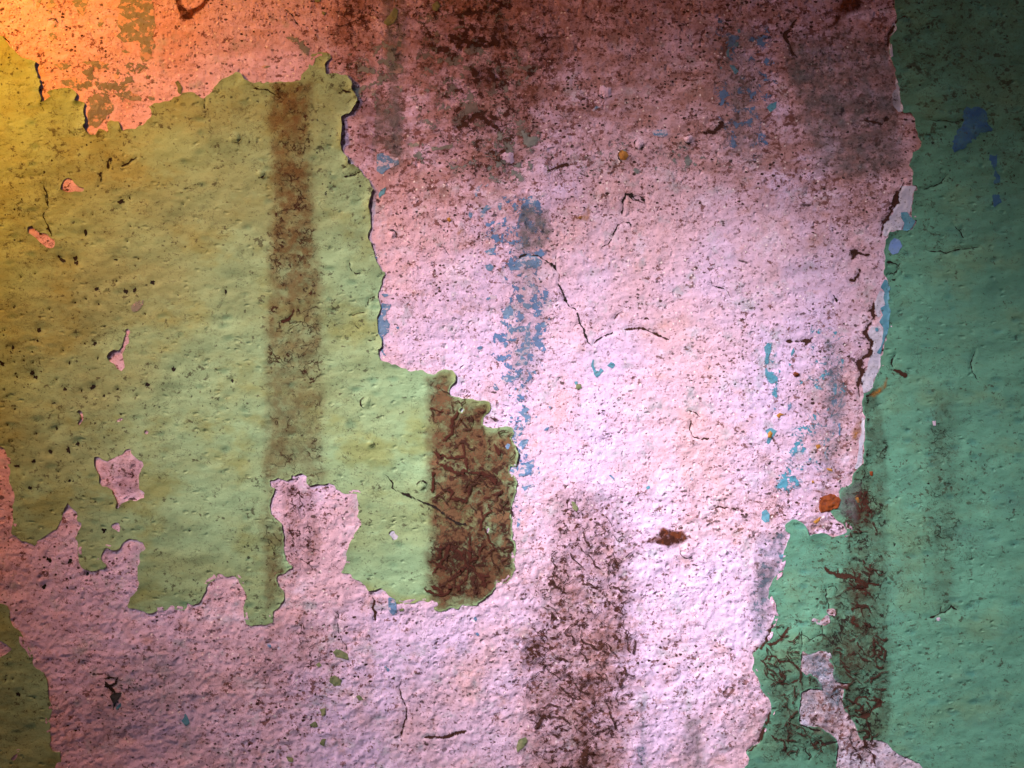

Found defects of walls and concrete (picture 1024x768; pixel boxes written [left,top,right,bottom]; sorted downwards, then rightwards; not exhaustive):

leakage [828,0,861,28]
leakage [331,0,563,179]
crack [601,193,645,248]
peeling [883,185,917,236]
leakage [266,82,322,570]
crack [519,254,669,344]
peeling [861,279,891,393]
peeling [855,417,865,469]
crack [386,475,466,525]
corrosion [814,494,841,524]
corrosion [647,528,687,546]
peeling [798,651,922,768]